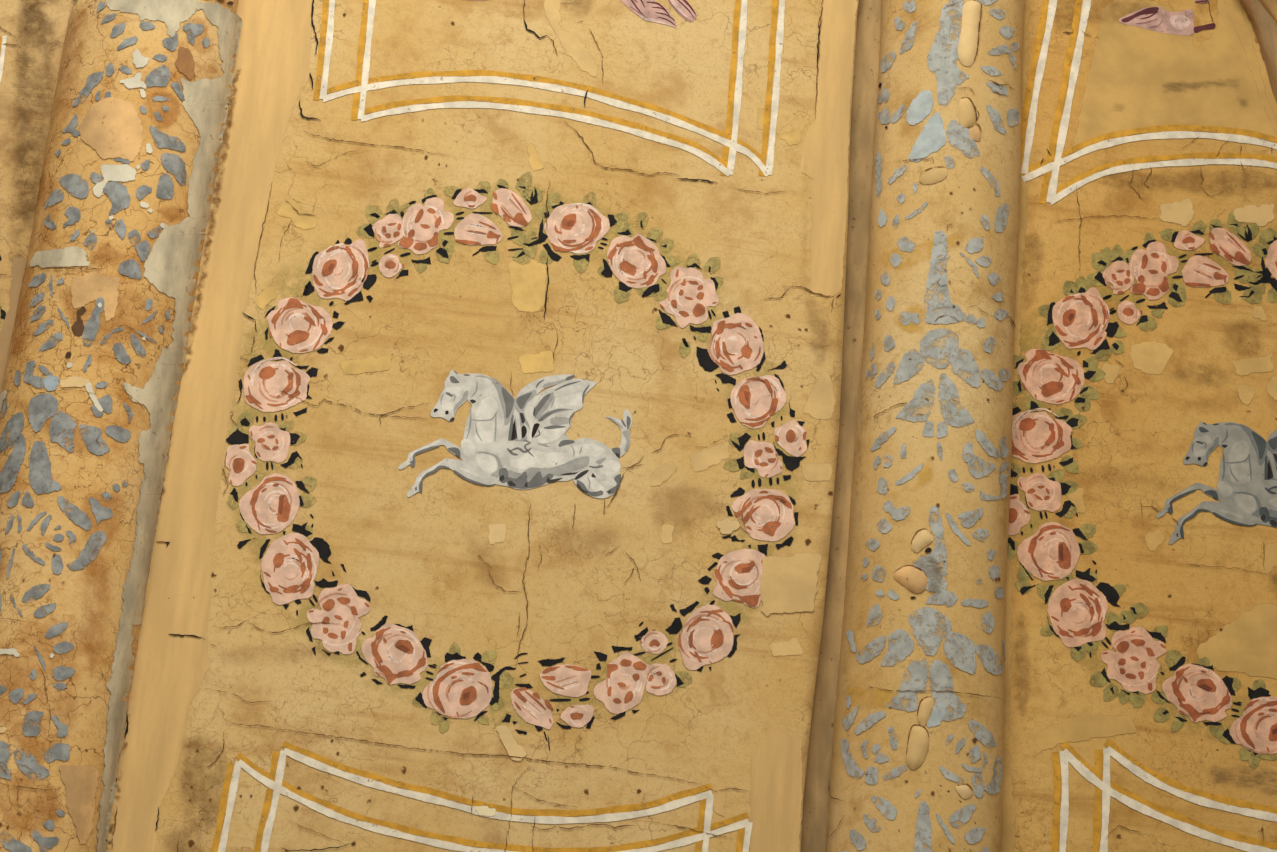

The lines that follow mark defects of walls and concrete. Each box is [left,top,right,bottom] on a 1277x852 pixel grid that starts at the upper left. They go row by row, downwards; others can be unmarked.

flaking render [30,246,90,268]
peeling [60,351,103,412]
flaking render [93,0,242,852]
crack [223,183,311,494]
crack [282,391,428,424]
crack [544,259,558,360]
crack [767,286,842,311]
crack [572,434,719,529]
crack [478,504,542,665]
flaking render [0,648,20,657]
crack [168,620,340,646]
crack [197,688,742,852]